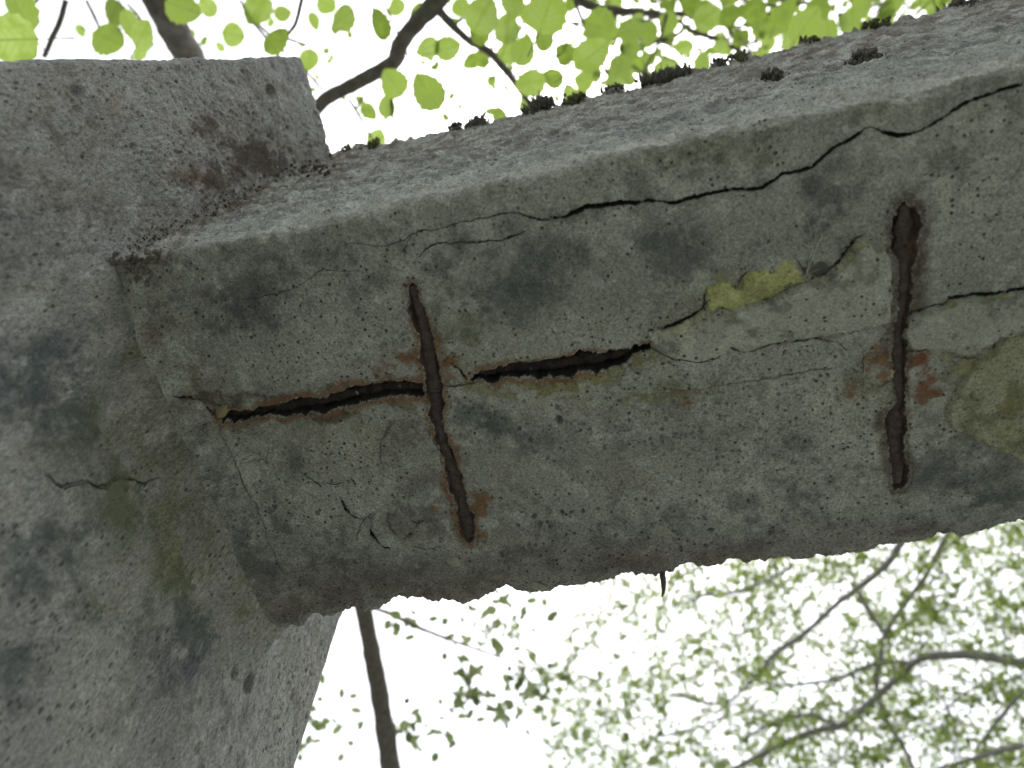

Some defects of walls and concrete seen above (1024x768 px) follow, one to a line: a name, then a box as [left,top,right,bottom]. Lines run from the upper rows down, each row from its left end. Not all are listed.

crack [346,84,1023,264]
crack [795,234,863,277]
crack [906,287,1024,317]
rust [864,192,942,497]
crack [443,359,475,387]
rust [196,279,653,548]
crack [45,475,158,492]